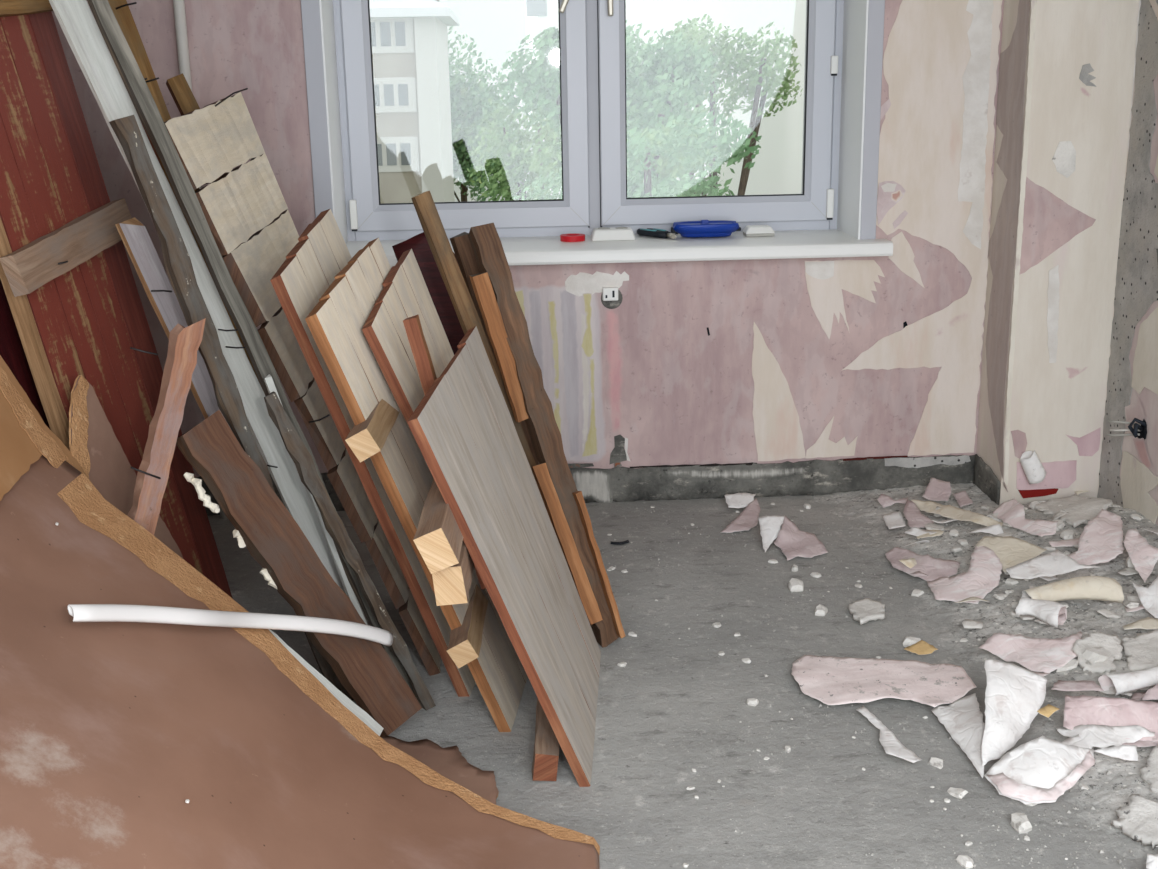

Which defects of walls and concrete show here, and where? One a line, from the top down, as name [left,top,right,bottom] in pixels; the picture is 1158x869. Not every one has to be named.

spalling [884,455,971,468]
peeling [1004,0,1037,485]
flaking render [1077,63,1096,99]
spalling [1097,0,1158,507]